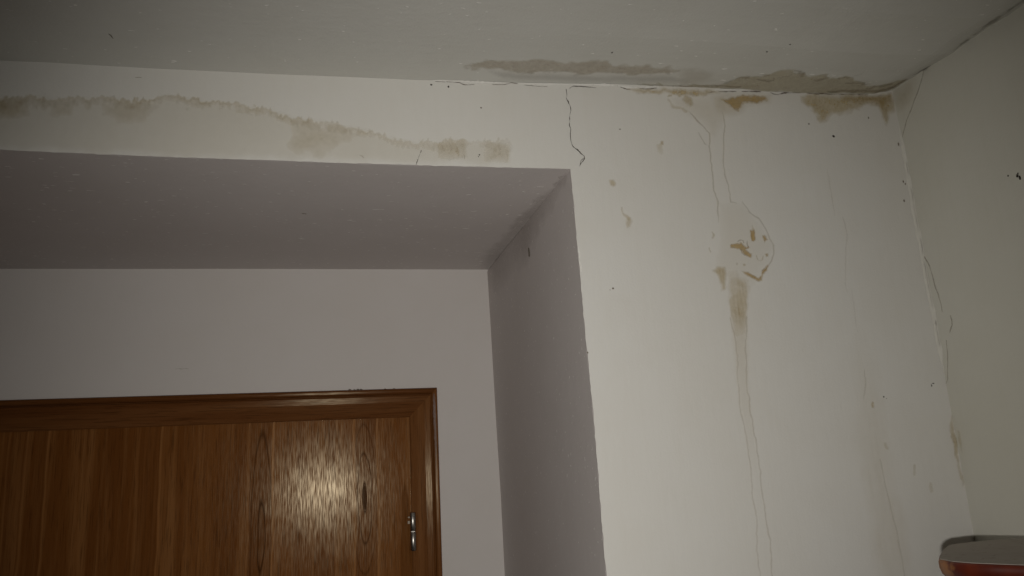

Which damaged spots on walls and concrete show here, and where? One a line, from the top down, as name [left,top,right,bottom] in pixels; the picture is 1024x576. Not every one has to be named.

crack [435,81,596,165]
peeling [731,231,766,257]